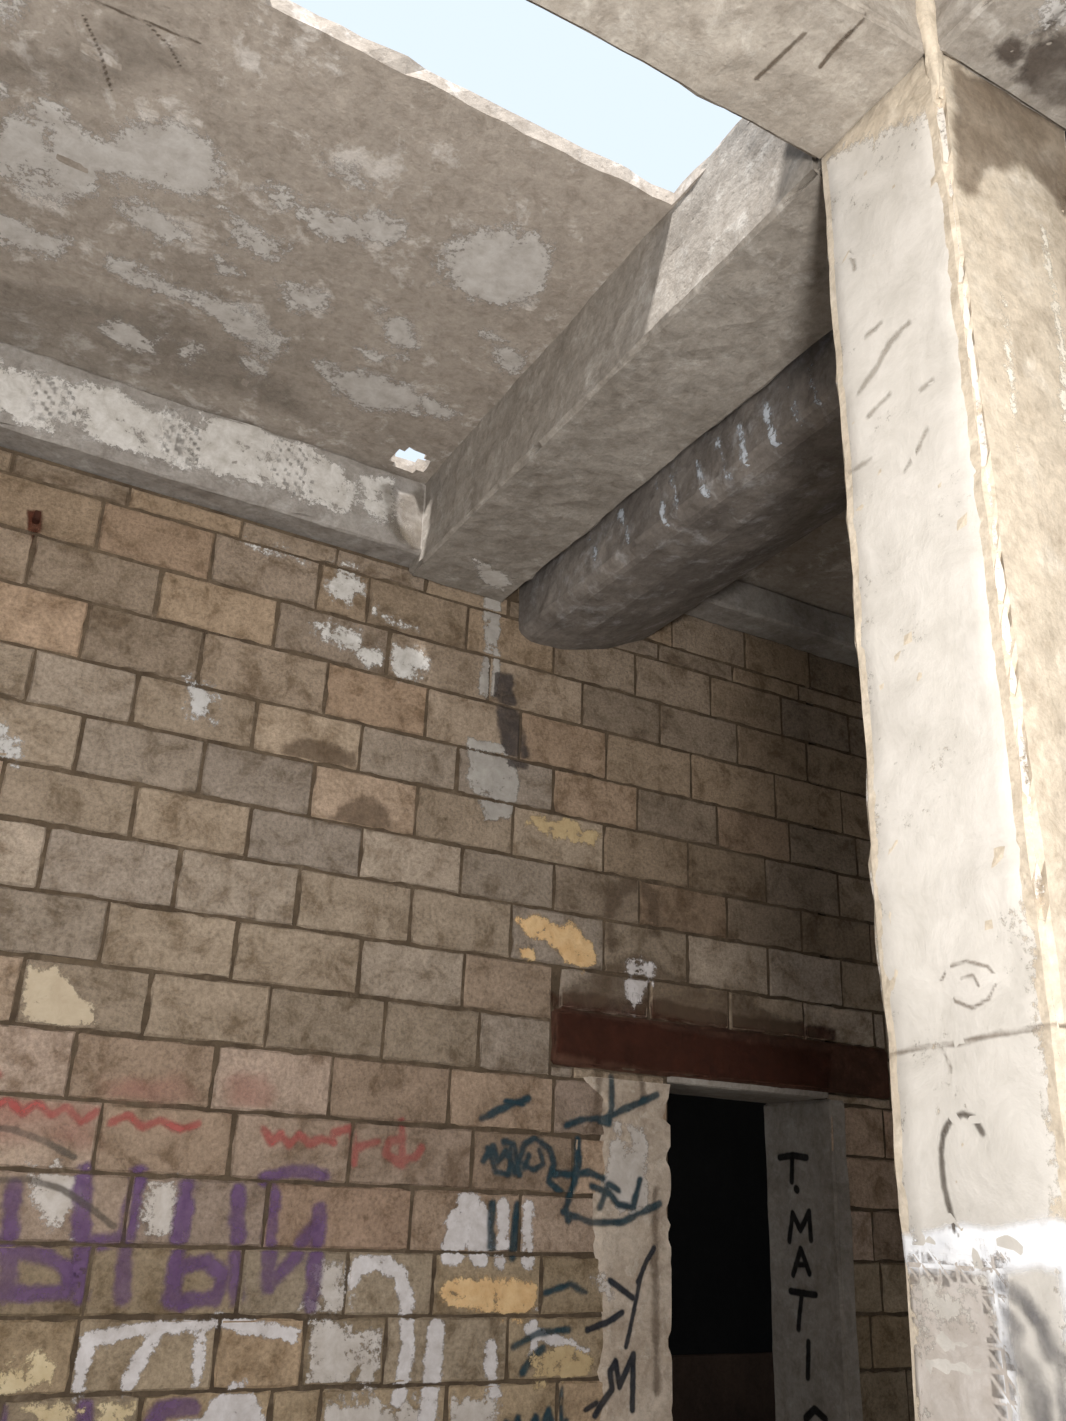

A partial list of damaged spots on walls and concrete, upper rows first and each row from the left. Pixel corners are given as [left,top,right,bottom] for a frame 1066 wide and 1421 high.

water stain [997,0,1066,86]
water stain [955,71,1048,150]
peeling [0,80,410,315]
water stain [1041,167,1066,213]
peeling [97,254,295,377]
water stain [467,558,529,821]
corrosion [551,993,835,1090]